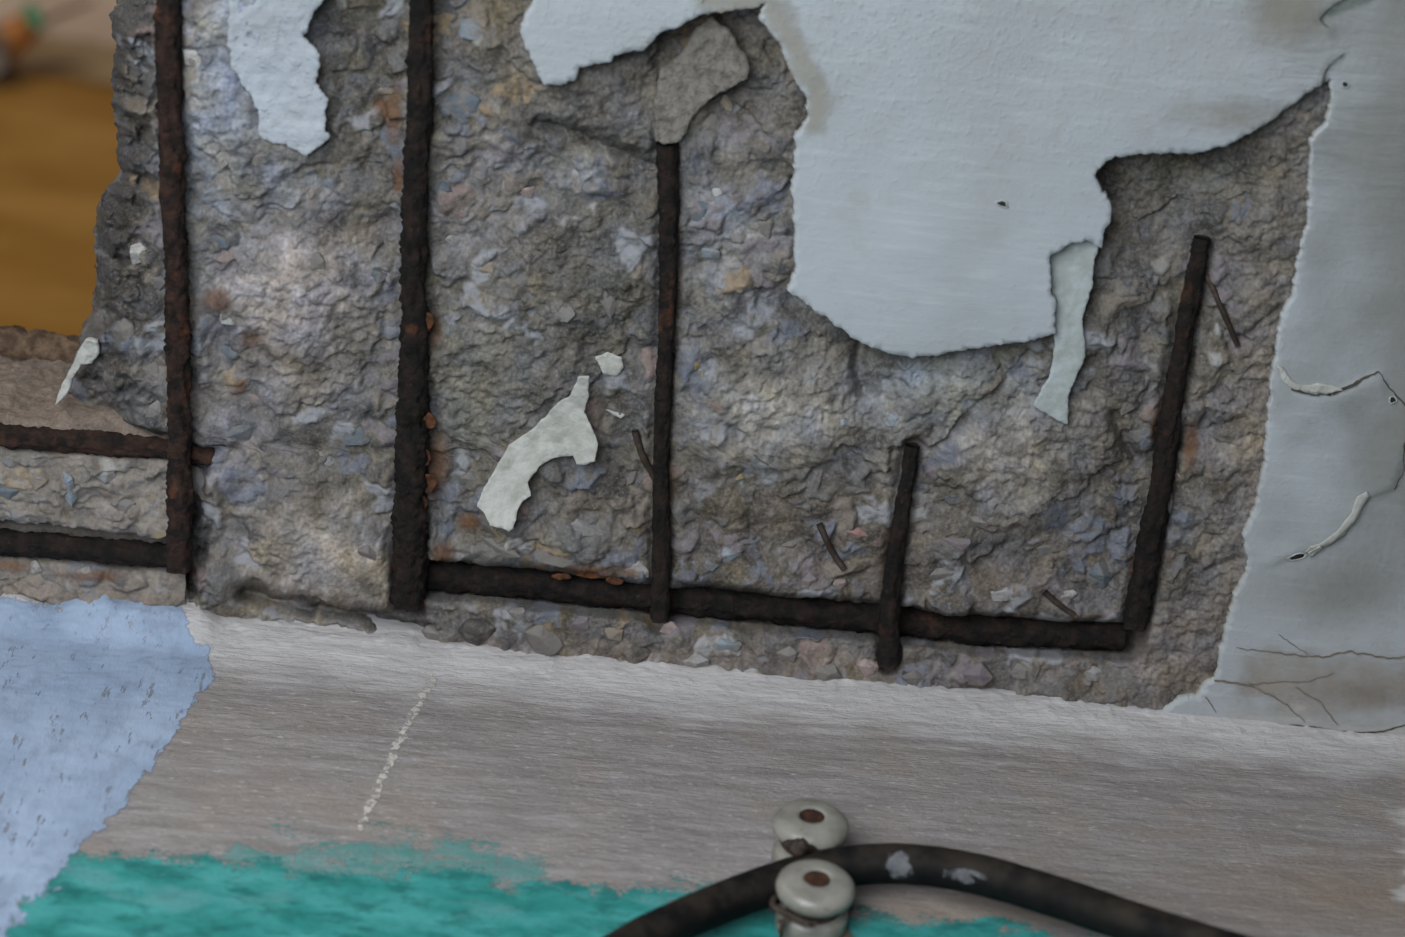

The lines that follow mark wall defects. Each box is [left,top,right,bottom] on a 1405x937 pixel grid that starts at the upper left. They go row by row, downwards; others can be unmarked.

crack [1319,0,1346,84]
spalling [0,0,1343,710]
crack [1291,371,1405,406]
crack [1205,634,1405,733]